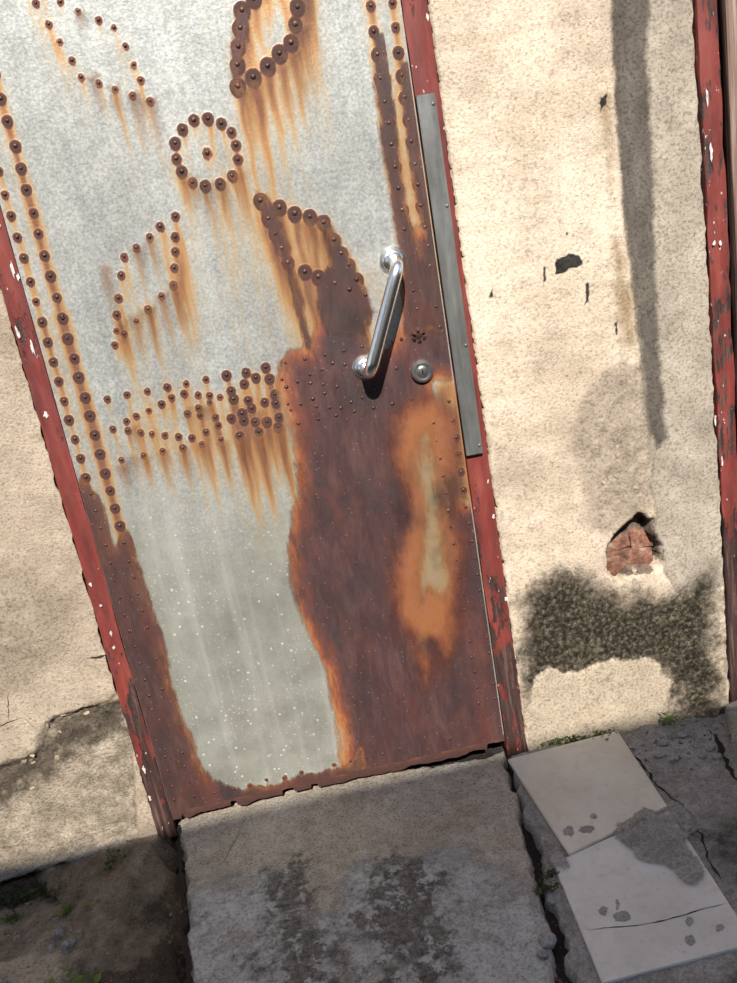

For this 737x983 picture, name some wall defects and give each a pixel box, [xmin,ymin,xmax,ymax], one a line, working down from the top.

corrosion [231,5,249,95]
corrosion [78,32,503,812]
flaking render [577,362,661,576]
leakage [516,570,727,719]